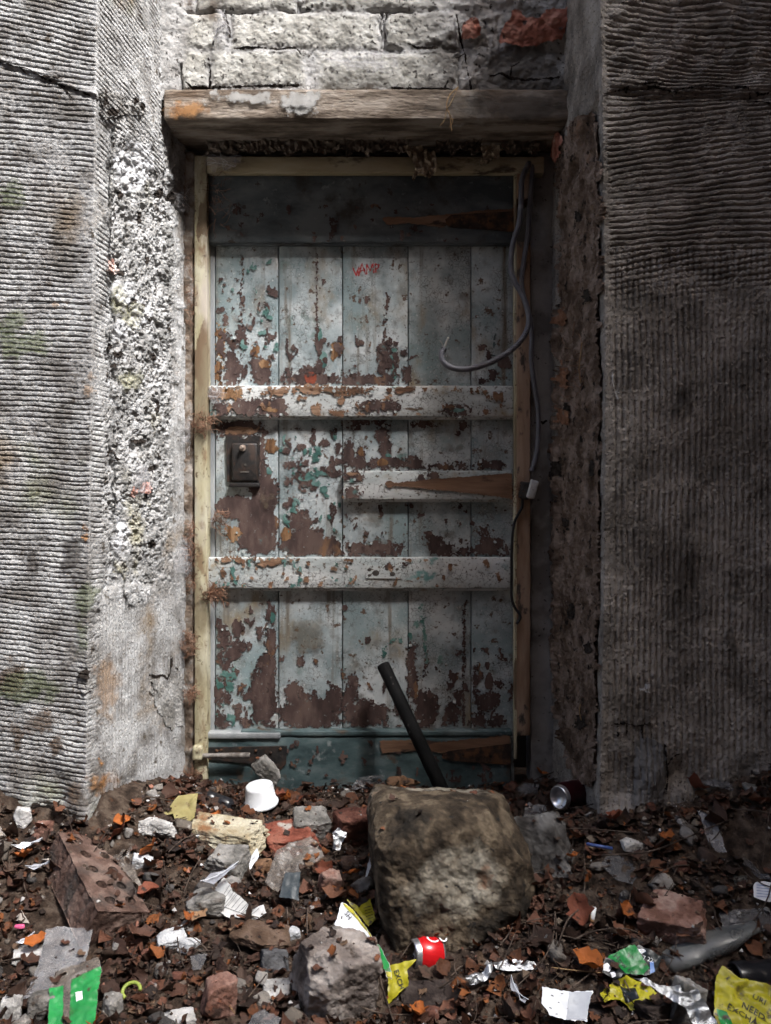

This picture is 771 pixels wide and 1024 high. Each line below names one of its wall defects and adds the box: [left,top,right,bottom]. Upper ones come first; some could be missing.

flaking render [499,7,567,47]
peeling [208,204,513,787]
crack [149,657,173,680]